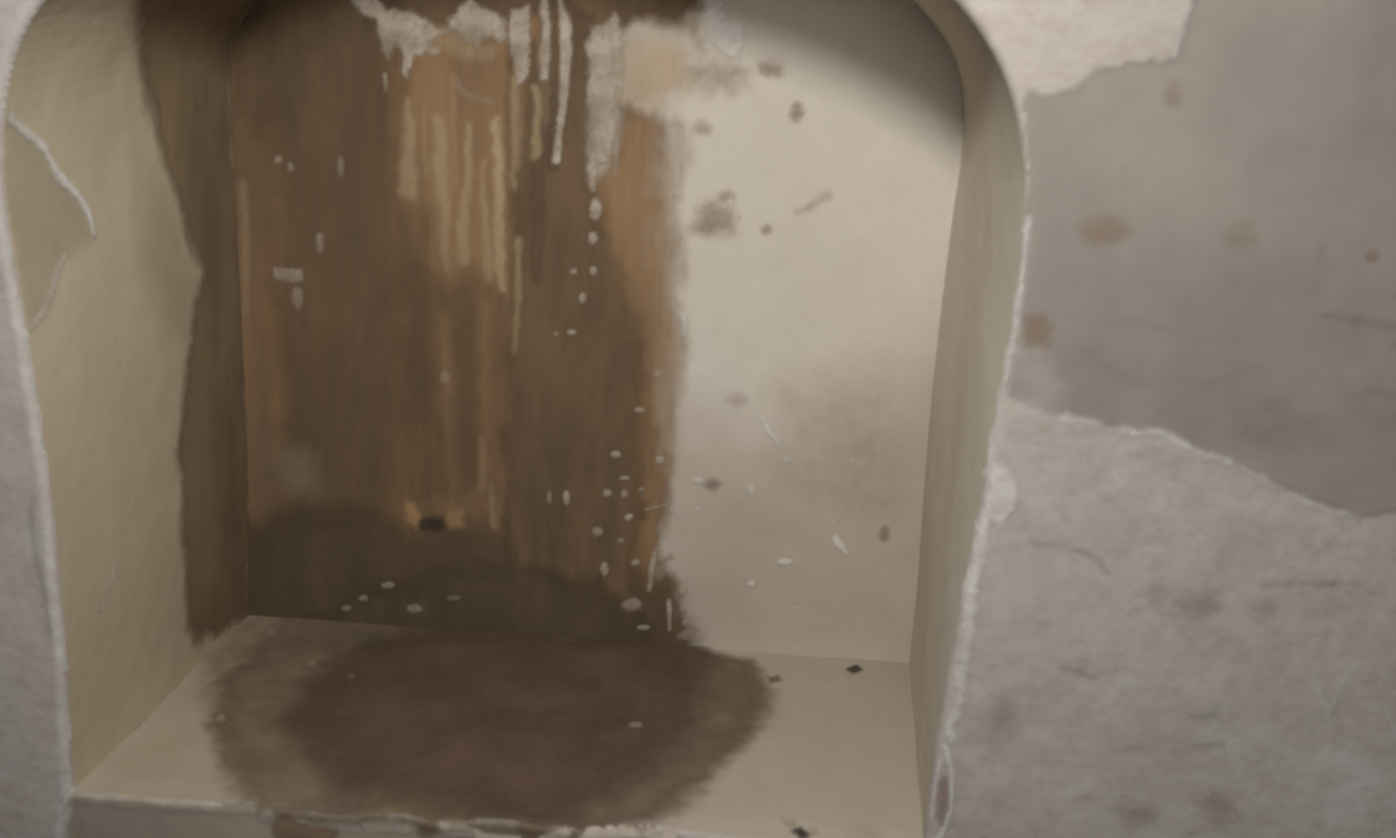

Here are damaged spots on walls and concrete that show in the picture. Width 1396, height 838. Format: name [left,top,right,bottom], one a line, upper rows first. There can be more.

crack [7,111,96,236]
peeling [1005,0,1396,517]
water stain [141,0,762,838]
flaking render [405,502,463,529]
peeling [625,552,656,607]
spalling [931,430,1016,838]
flaking render [56,717,677,838]